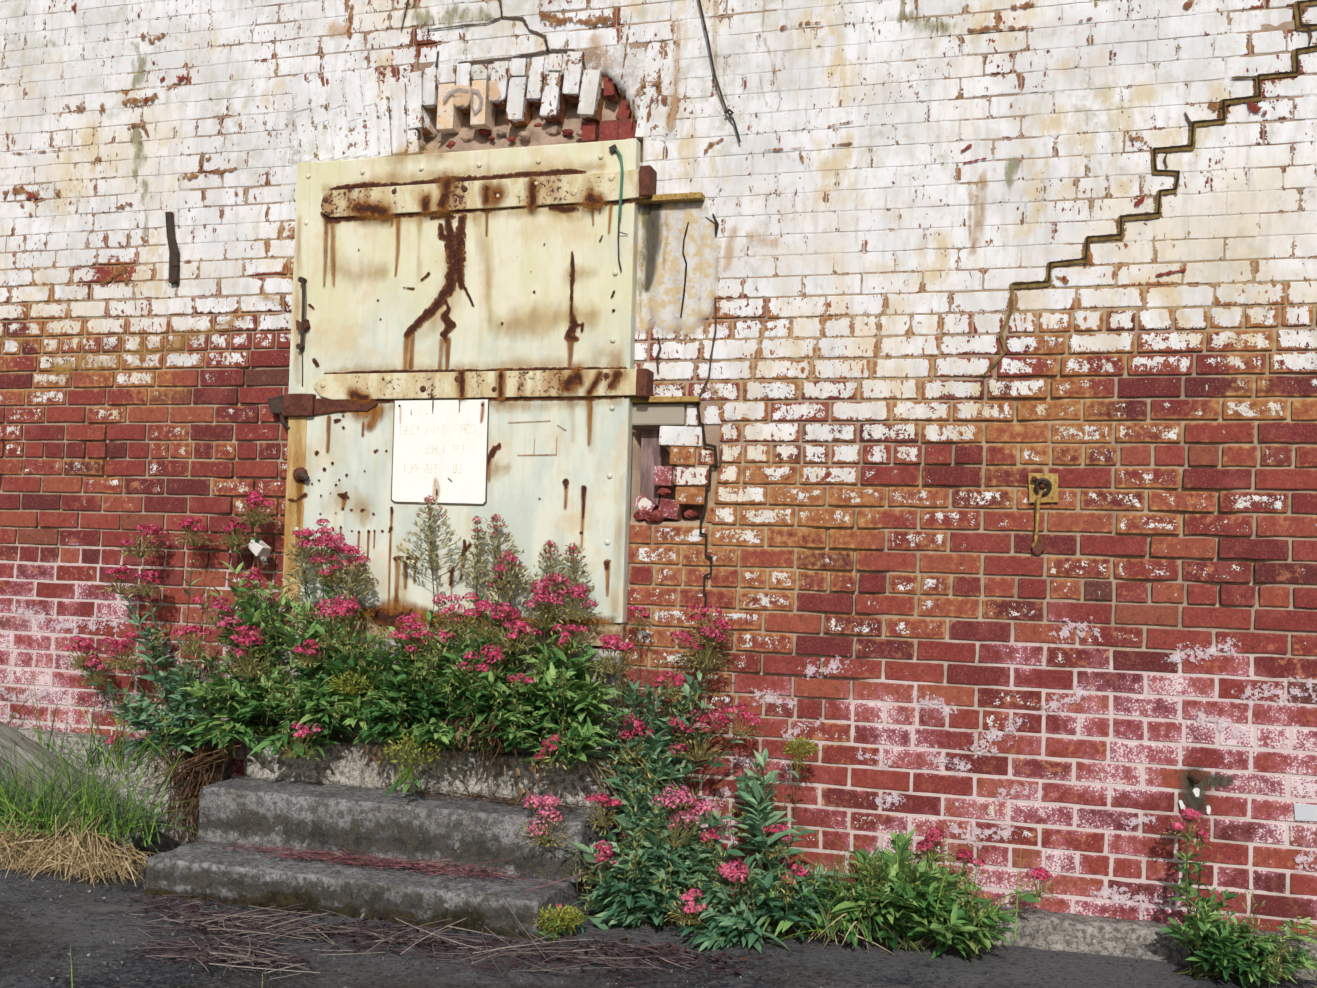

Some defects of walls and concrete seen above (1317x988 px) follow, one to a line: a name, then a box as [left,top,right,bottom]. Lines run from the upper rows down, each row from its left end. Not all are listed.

crack [400,0,586,74]
flaking render [478,129,516,143]
crack [983,0,1317,376]
rust [288,168,637,631]
efflorescence [1049,616,1100,644]
efflorescence [798,654,852,680]
efflorescence [1162,637,1242,670]
efflorescence [1191,676,1317,739]
efflorescence [925,684,1091,777]
water stain [1179,788,1211,814]
efflorescence [944,820,1017,850]
efflorescence [1090,884,1187,911]